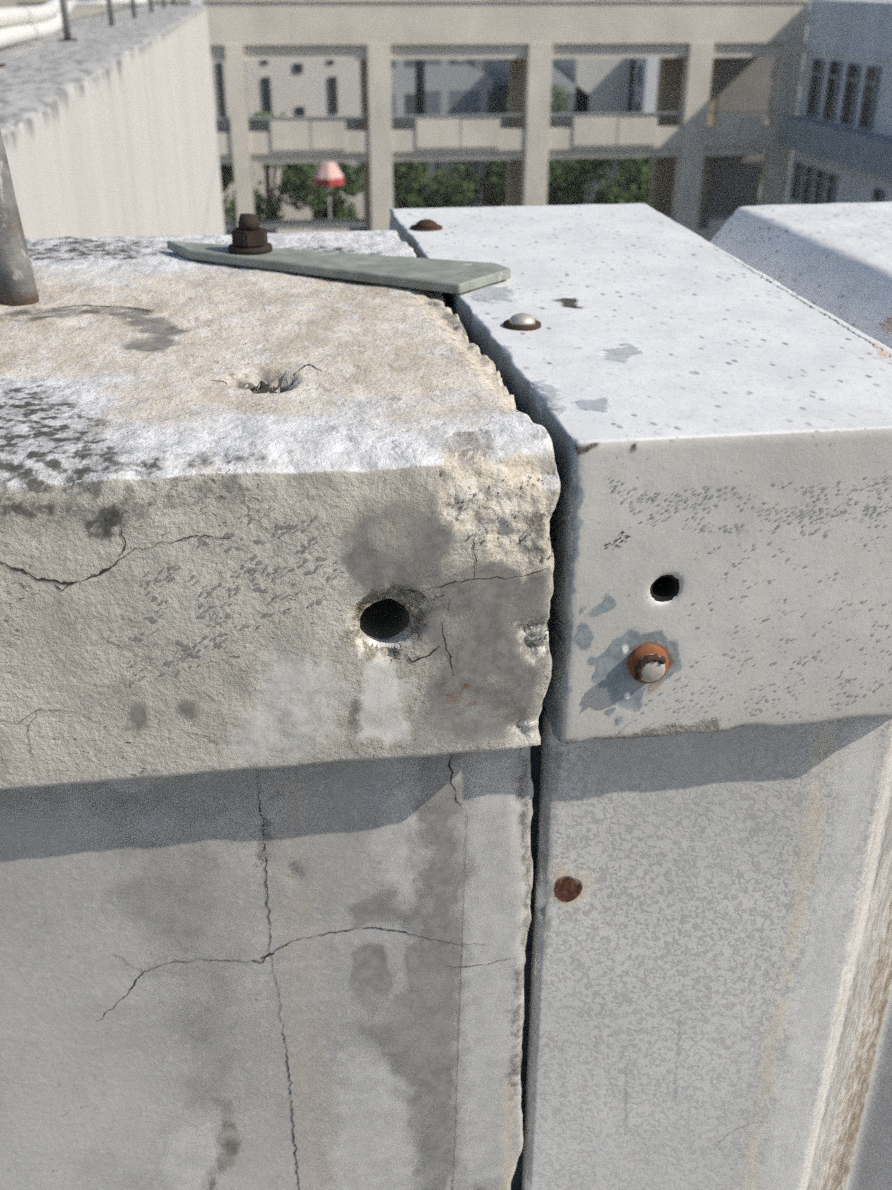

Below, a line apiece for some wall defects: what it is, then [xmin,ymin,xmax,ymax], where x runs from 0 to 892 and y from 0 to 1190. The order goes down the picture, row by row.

crack [0,527,231,591]
crack [239,485,286,544]
spalling [439,431,892,739]
corrosion [634,642,673,680]
crack [0,709,105,758]
water stain [240,665,329,757]
water stain [334,497,550,1190]
crack [98,754,517,1190]